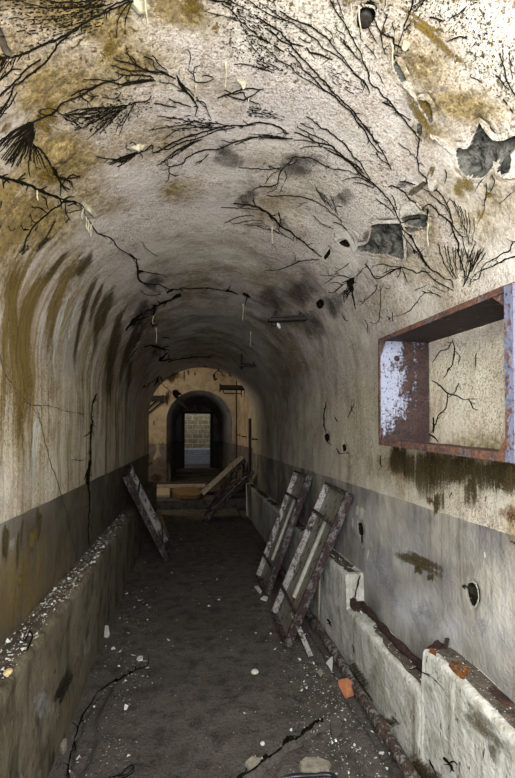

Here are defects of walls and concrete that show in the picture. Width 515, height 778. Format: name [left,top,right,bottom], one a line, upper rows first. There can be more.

damp [0,0,105,37]
damp [118,0,151,16]
spalling [389,56,515,186]
crack [0,0,515,392]
spalling [323,177,438,264]
damp [0,221,151,472]
crack [429,340,477,442]
crack [0,355,97,552]
damp [389,447,515,513]
damp [399,553,442,581]
crack [64,658,149,778]
crack [236,718,323,778]